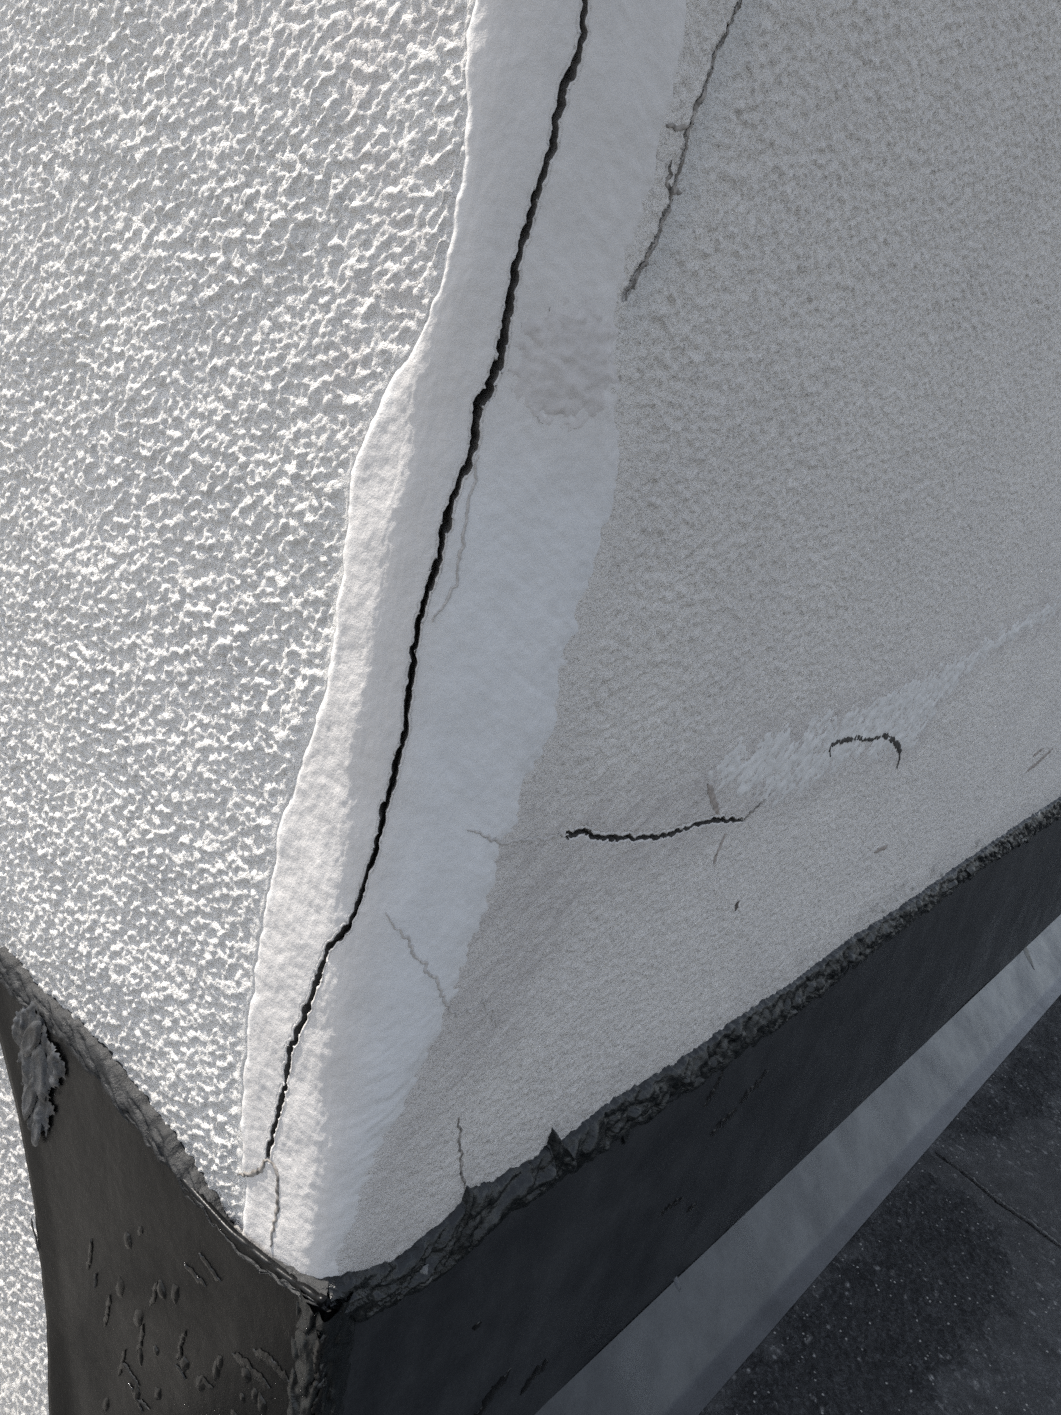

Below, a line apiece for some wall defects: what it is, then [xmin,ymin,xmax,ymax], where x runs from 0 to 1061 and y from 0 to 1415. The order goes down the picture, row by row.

crack [625,0,742,299]
crack [237,0,591,1247]
crack [468,794,770,845]
crack [829,733,902,769]